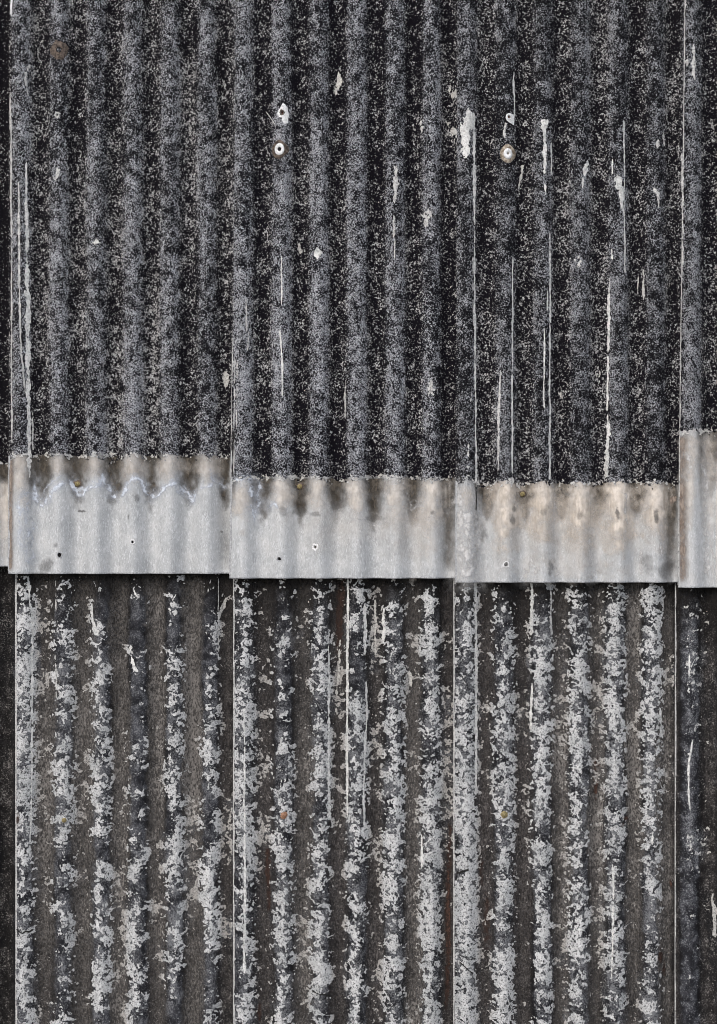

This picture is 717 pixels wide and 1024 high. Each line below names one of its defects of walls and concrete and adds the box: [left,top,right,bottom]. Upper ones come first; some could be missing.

water stain [684,44,696,80]
water stain [0,93,693,577]
peeling [16,574,711,1024]